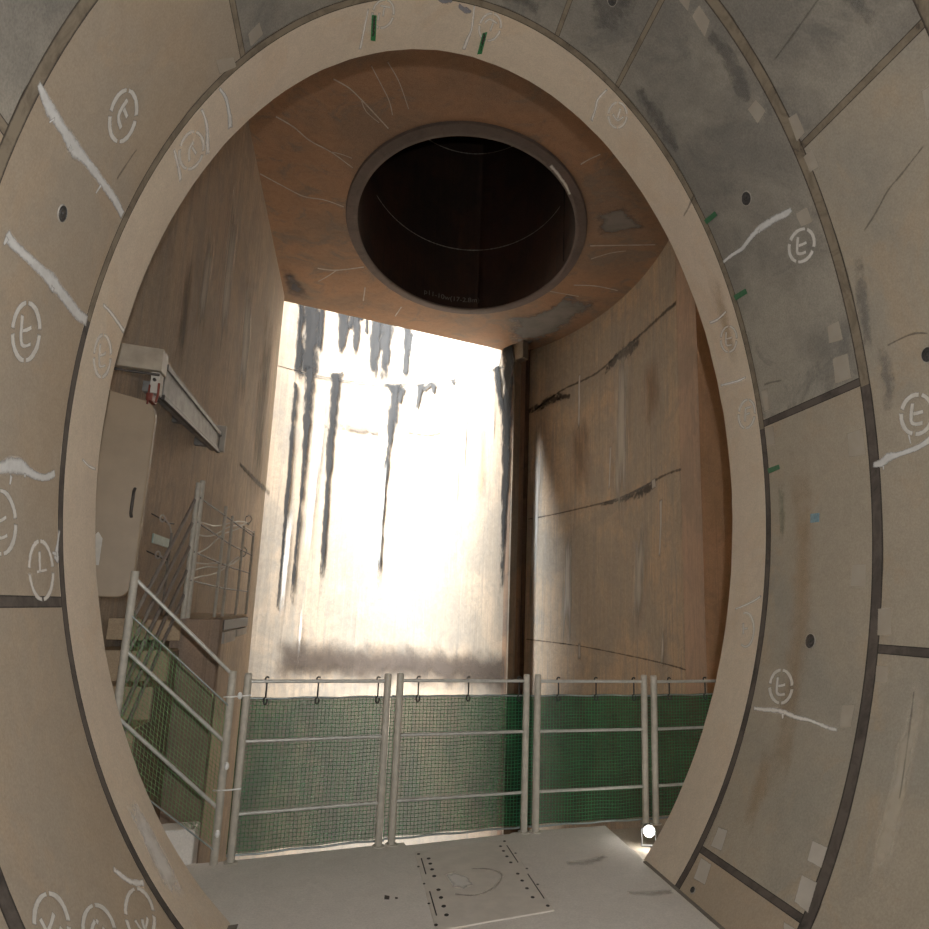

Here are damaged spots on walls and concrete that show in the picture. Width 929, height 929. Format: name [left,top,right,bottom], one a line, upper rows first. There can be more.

damp [276,304,343,608]
damp [337,313,413,574]
damp [416,381,436,408]